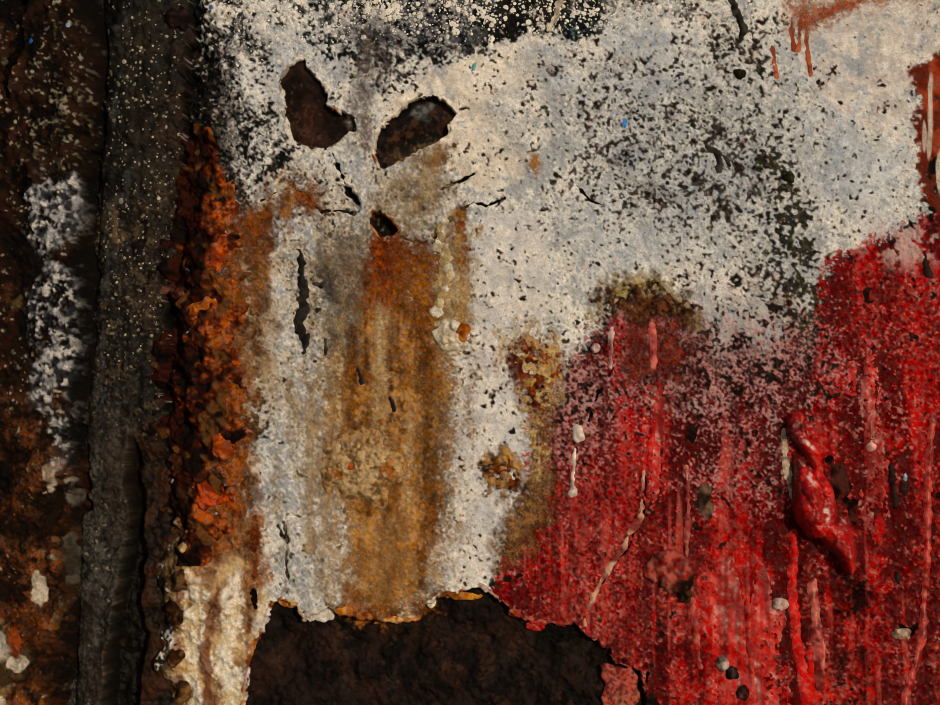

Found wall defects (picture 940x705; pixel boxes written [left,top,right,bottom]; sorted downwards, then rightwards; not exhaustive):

crack [3,0,28,98]
peeling [278,53,358,153]
peeling [372,95,461,169]
rust [146,124,483,629]
rust [166,643,186,668]
rust [174,680,193,705]
peeling [240,583,659,705]